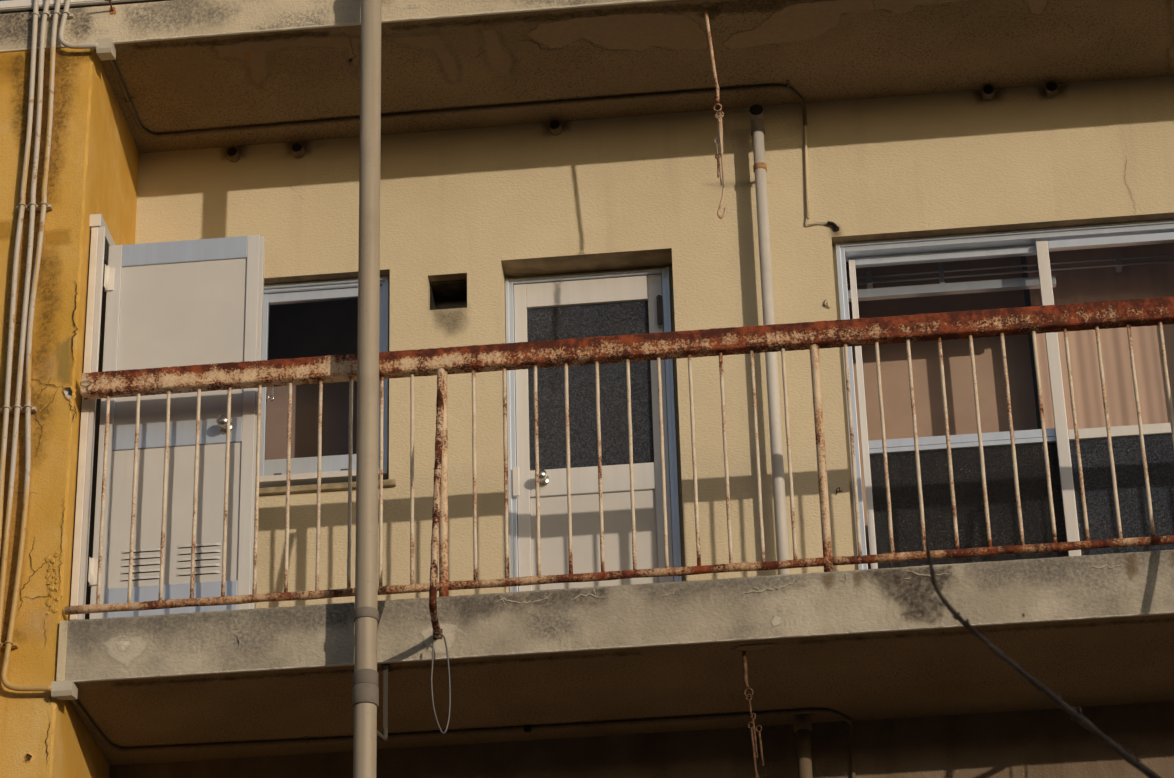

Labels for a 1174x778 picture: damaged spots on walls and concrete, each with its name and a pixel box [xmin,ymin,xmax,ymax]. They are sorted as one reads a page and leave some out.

damp [136,32,328,49]
damp [393,0,801,30]
peeling [526,12,708,52]
peeling [722,0,972,50]
damp [866,565,952,621]